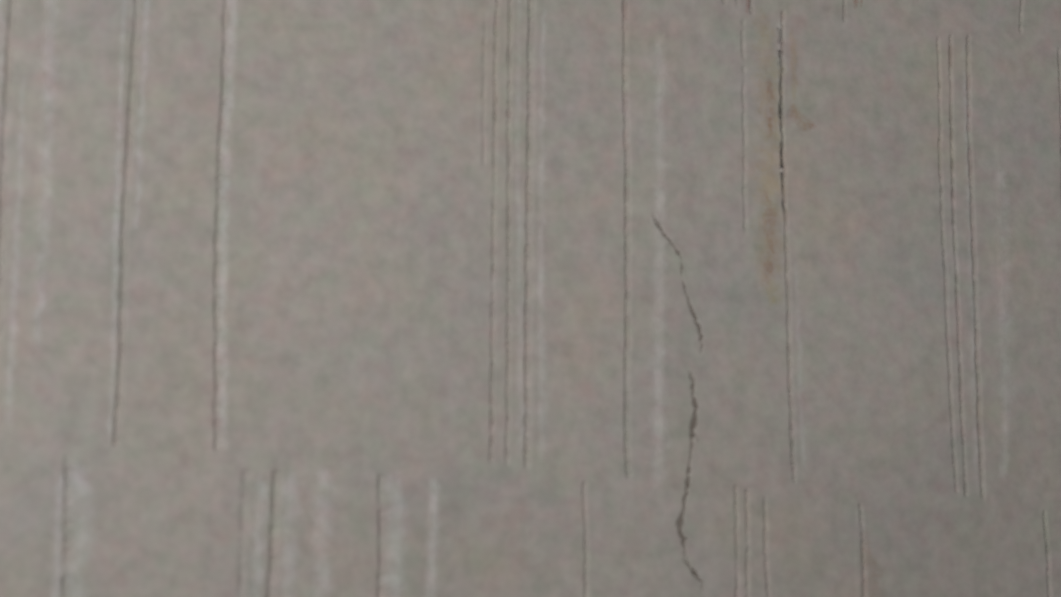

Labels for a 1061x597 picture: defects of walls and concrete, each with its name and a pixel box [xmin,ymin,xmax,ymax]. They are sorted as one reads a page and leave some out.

crack [654,217,703,350]
crack [675,373,703,590]